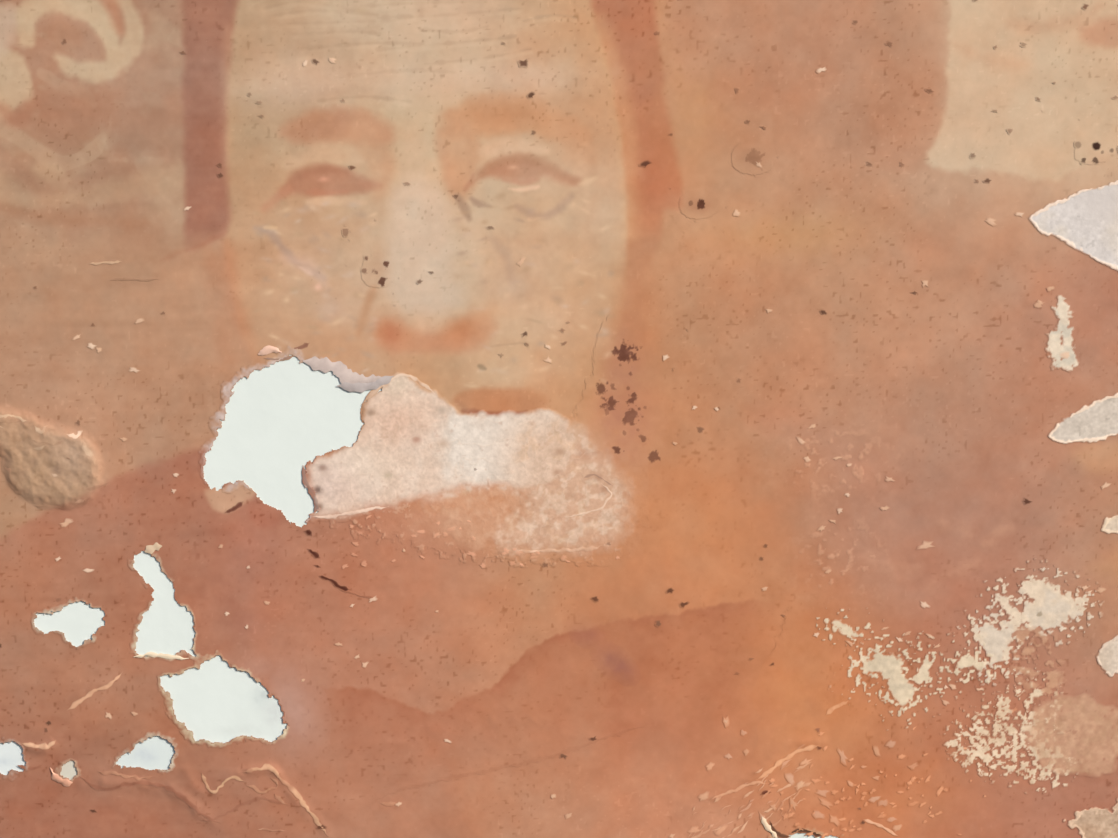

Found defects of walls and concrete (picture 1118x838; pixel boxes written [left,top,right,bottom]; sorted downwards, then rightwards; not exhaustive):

peeling [1015,180,1118,271]
peeling [1034,286,1080,372]
flaking render [203,355,382,527]
peeling [1048,392,1118,444]
peeling [1101,514,1118,534]
flaking render [34,601,105,647]
flaking render [133,551,288,743]
peeling [769,558,1118,838]
flaking render [0,741,26,775]
flaking render [60,760,77,780]
flaking render [116,736,175,770]